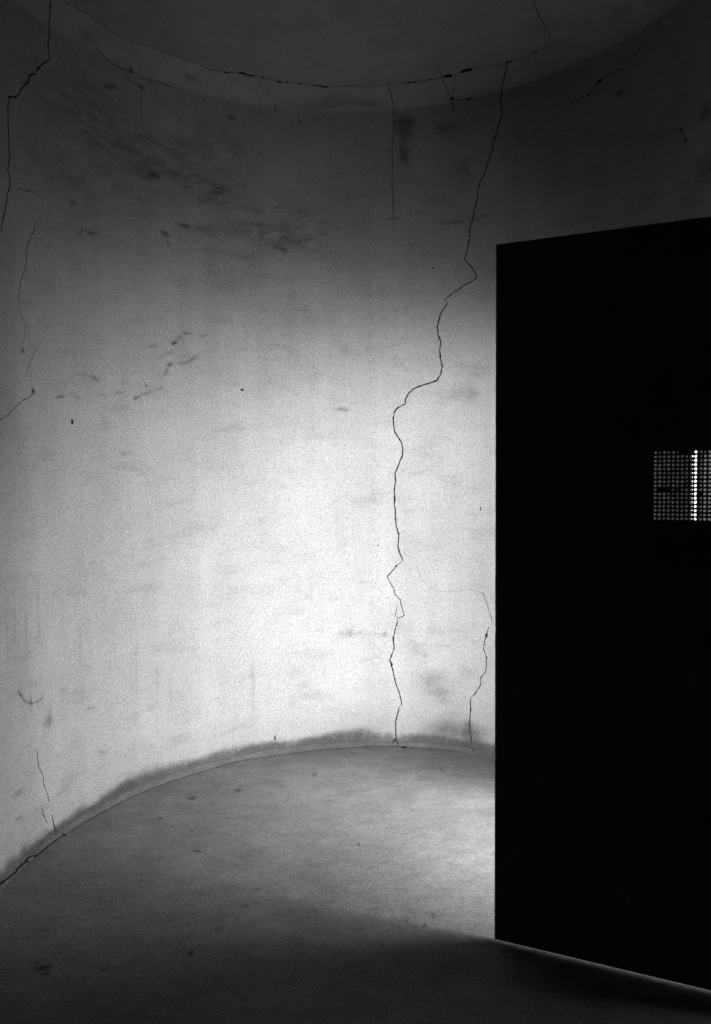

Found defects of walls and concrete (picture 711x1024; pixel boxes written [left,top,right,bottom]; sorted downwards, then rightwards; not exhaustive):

crack [0,0,558,751]